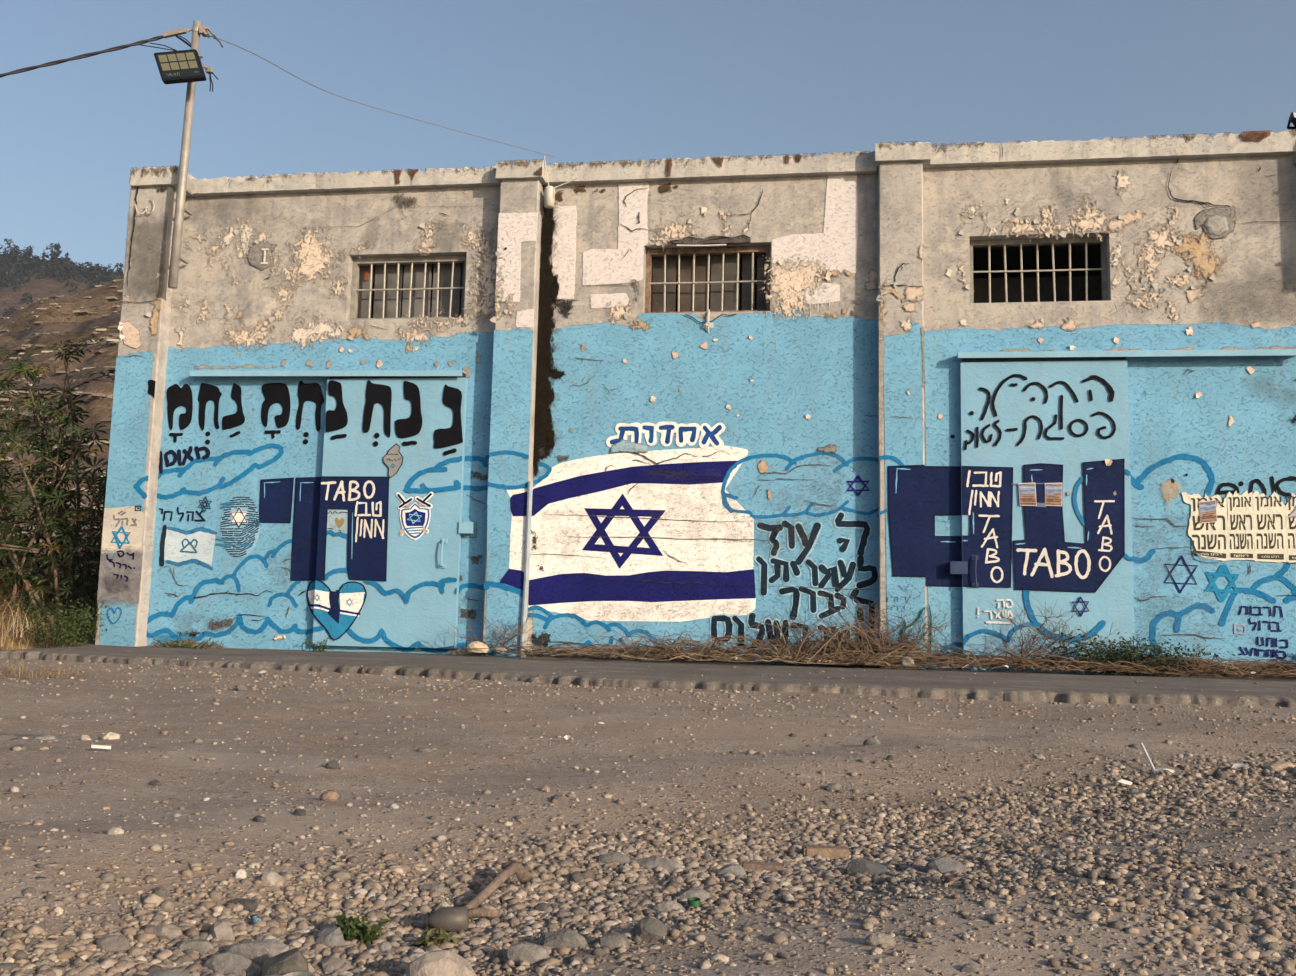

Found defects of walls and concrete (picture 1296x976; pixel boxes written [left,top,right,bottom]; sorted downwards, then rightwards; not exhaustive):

peeling [1113,169,1131,196]
crack [1168,159,1291,224]
peeling [118,253,165,348]
peeling [175,217,384,370]
peeling [393,192,518,354]
peeling [434,353,480,378]
peeling [754,255,924,456]
peeling [954,190,1237,352]